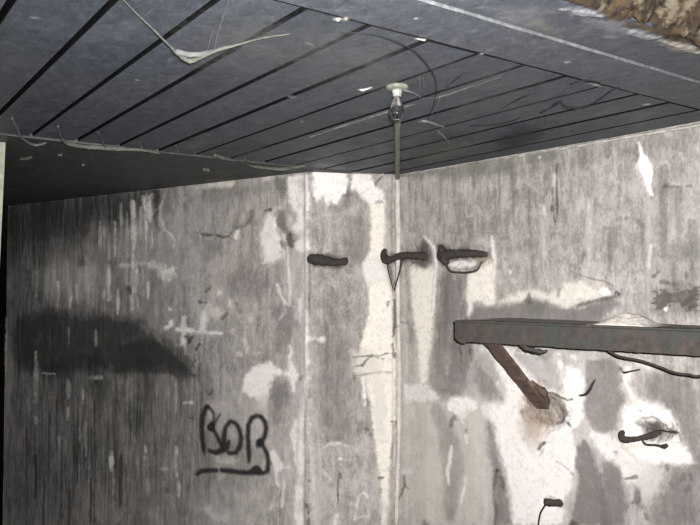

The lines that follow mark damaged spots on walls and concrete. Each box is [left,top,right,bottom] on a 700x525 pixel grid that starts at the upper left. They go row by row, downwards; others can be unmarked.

spalling [558,0,700,55]